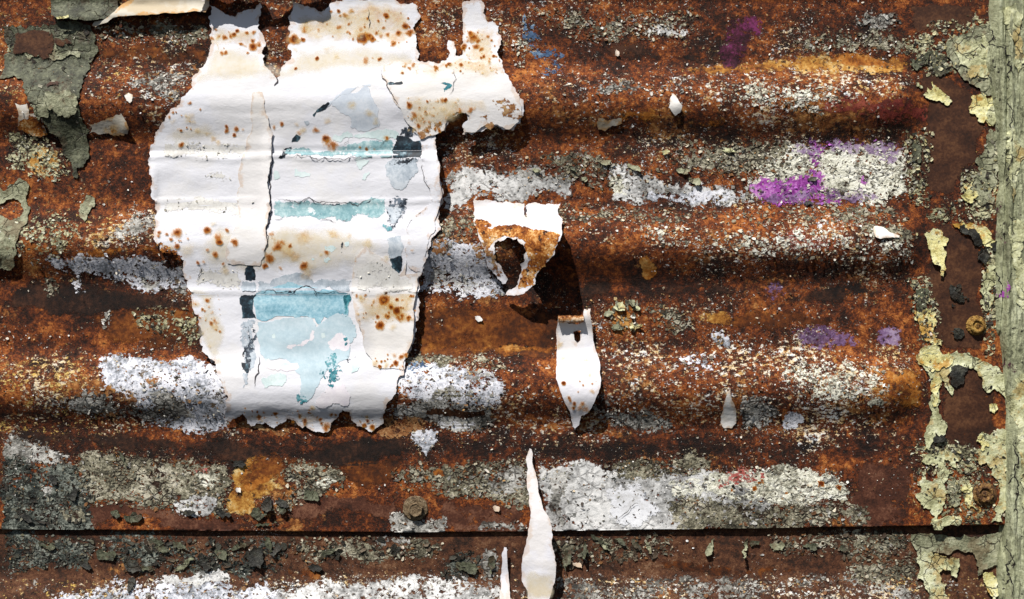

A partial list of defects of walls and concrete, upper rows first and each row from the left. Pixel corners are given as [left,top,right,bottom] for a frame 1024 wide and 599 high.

corrosion [289,9,413,46]
corrosion [682,52,907,79]
corrosion [407,98,522,139]
corrosion [817,73,983,195]
corrosion [11,278,221,348]
peeling [0,0,522,599]
corrosion [356,292,558,369]
corrosion [431,219,560,289]
peeling [354,0,1024,599]
corrosion [925,222,987,349]
corrosion [938,368,996,465]
corrosion [14,415,426,531]